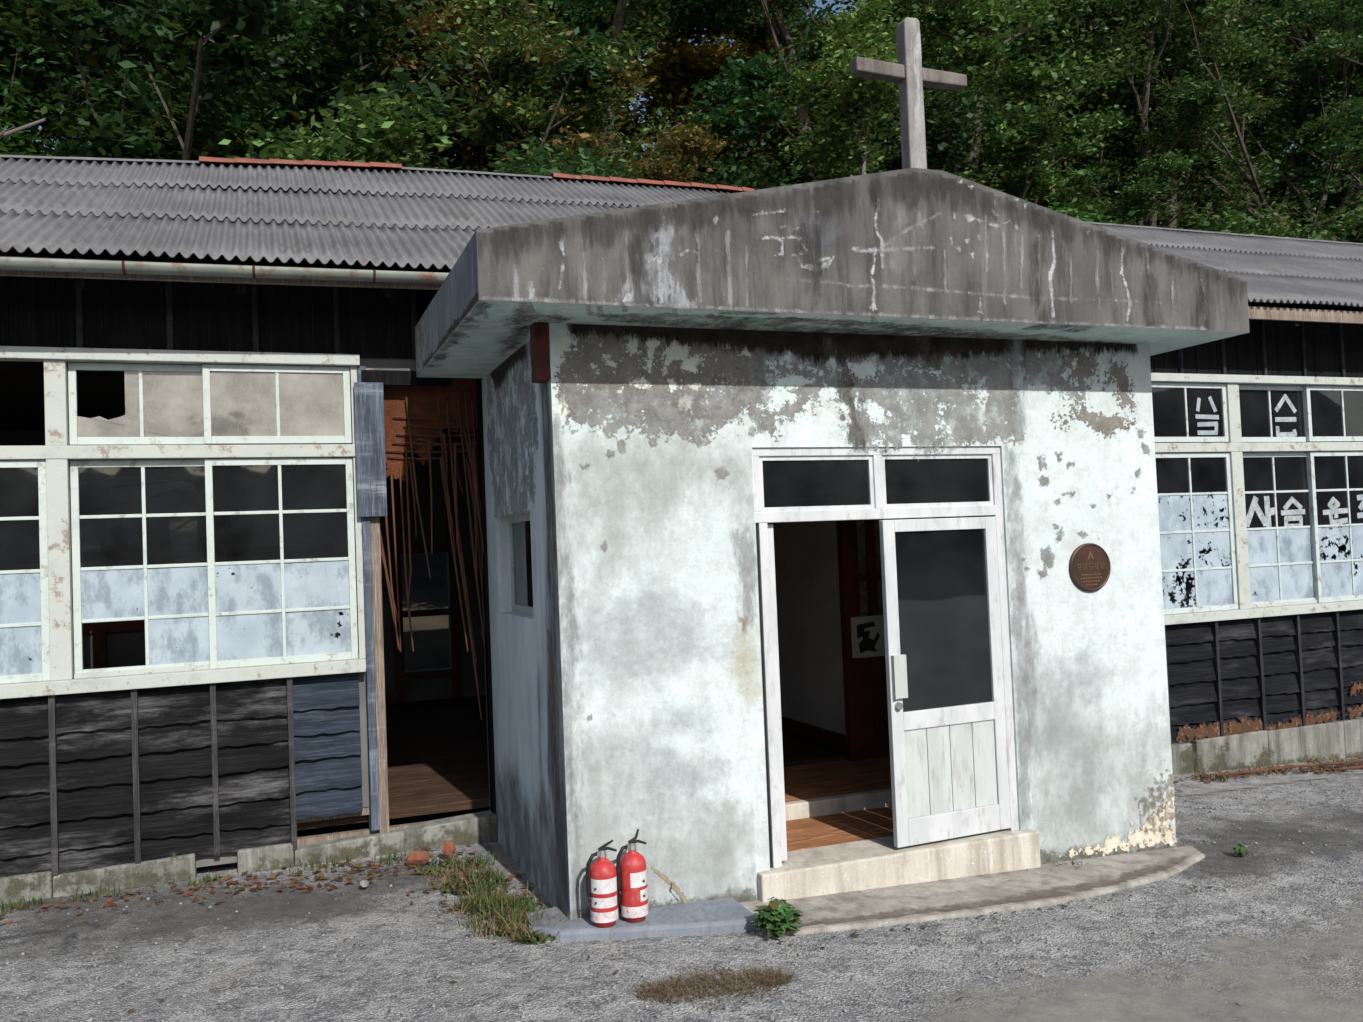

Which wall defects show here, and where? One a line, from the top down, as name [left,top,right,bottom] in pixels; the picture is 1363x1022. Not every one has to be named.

damp [1139,244,1242,330]
peeling [549,324,1150,493]
peeling [1037,451,1076,505]
damp [480,171,1138,919]
peeling [1021,523,1063,580]
peeling [1059,769,1177,858]
damp [793,856,1190,927]